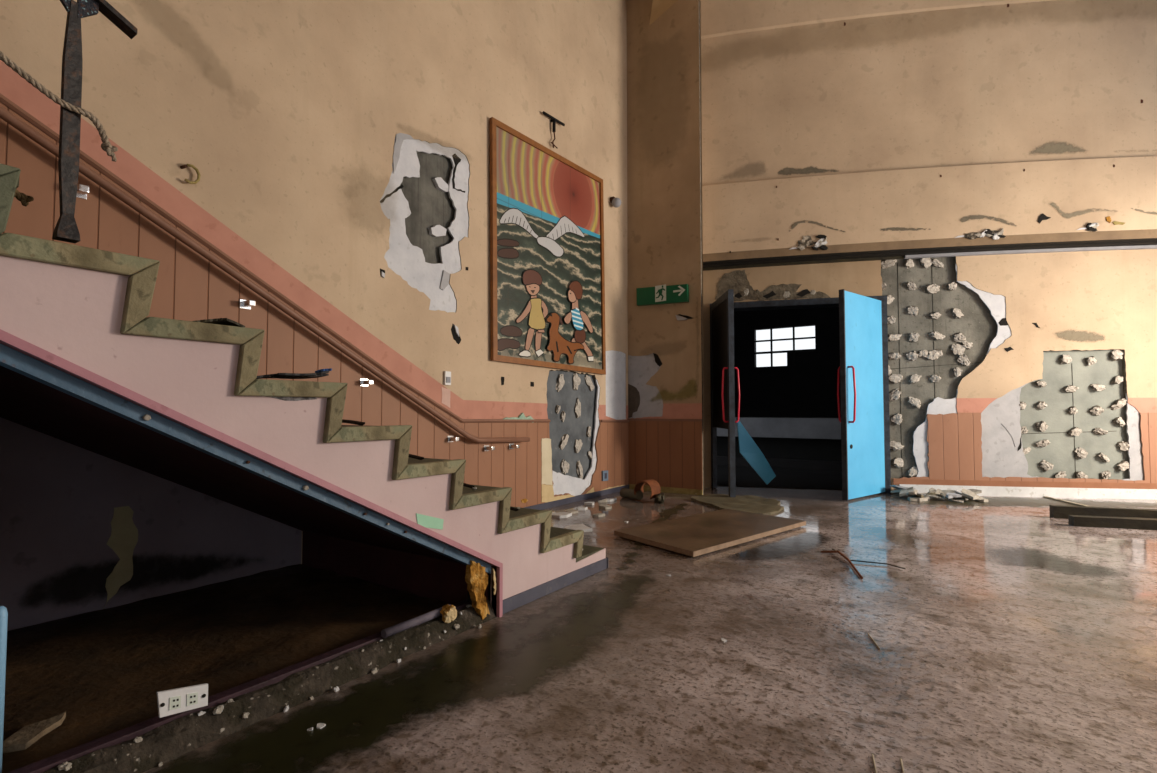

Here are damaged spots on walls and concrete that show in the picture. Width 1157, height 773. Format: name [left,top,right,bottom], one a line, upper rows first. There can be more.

spalling [380,133,470,344]
flaking render [789,235,828,251]
flaking render [955,228,1006,240]
flaking render [1077,216,1125,232]
flaking render [715,270,830,301]
spalling [881,257,1014,478]
spalling [521,350,663,503]
spalling [981,350,1144,481]
leakage [995,549,1114,575]